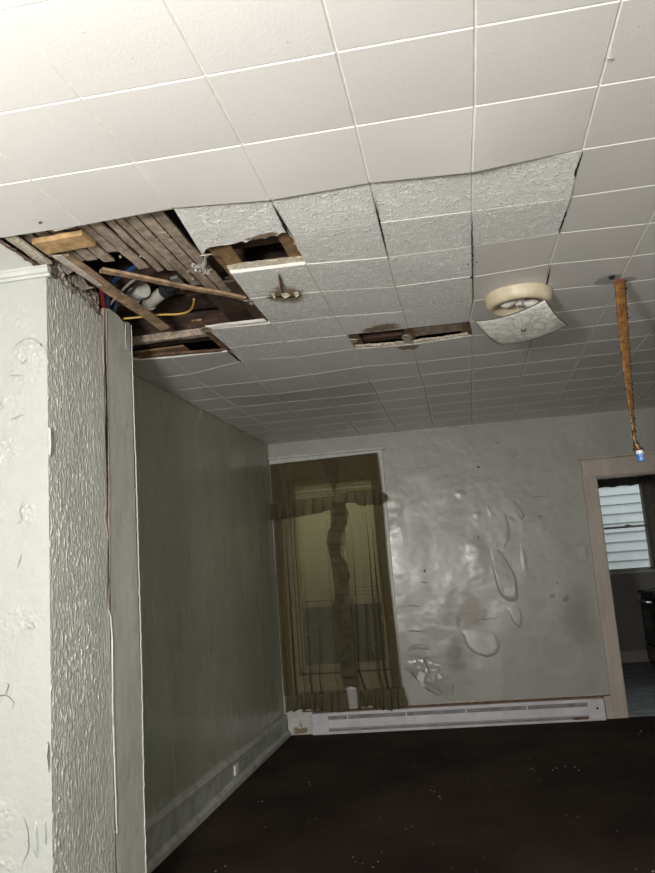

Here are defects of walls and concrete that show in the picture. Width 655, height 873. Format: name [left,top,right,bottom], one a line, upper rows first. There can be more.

crack [467,221,478,279]
flaking render [42,252,100,314]
peeling [3,326,47,387]